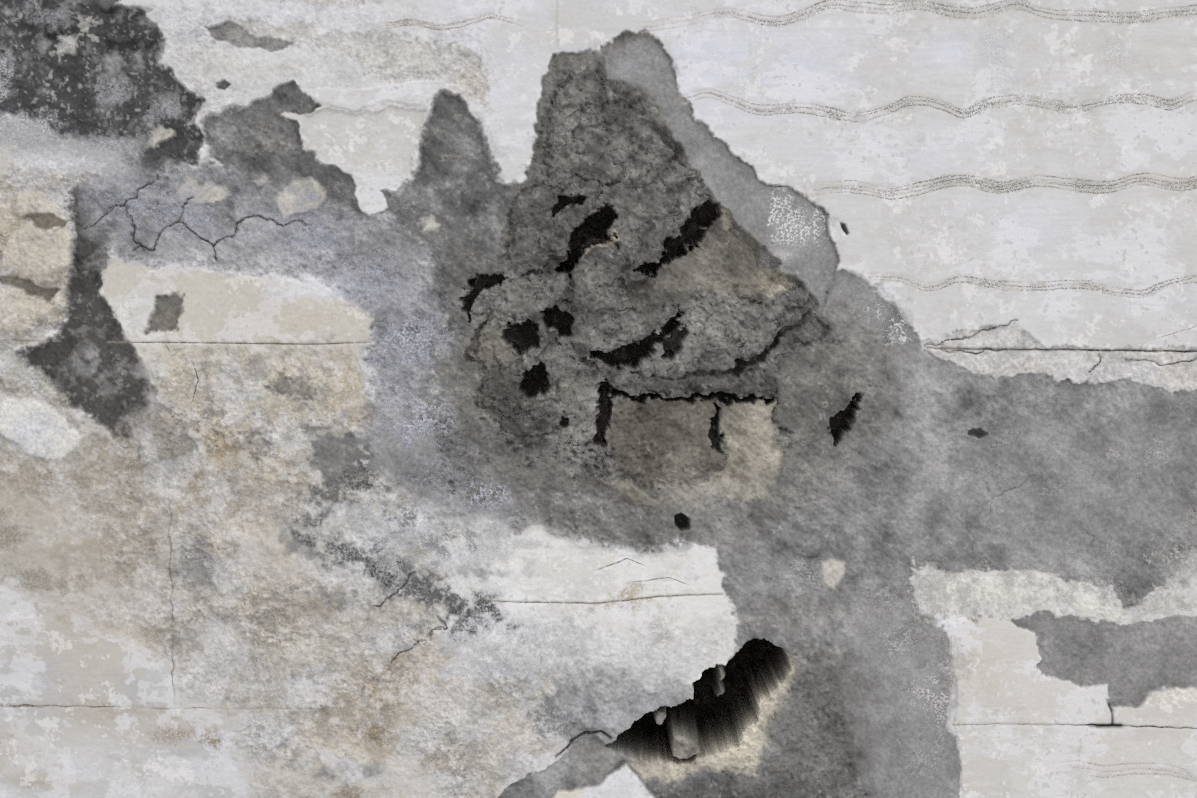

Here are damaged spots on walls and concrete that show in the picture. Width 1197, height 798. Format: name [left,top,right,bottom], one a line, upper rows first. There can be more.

crack [80,154,453,494]
spalling [0,0,606,798]
spalling [230,17,1197,798]